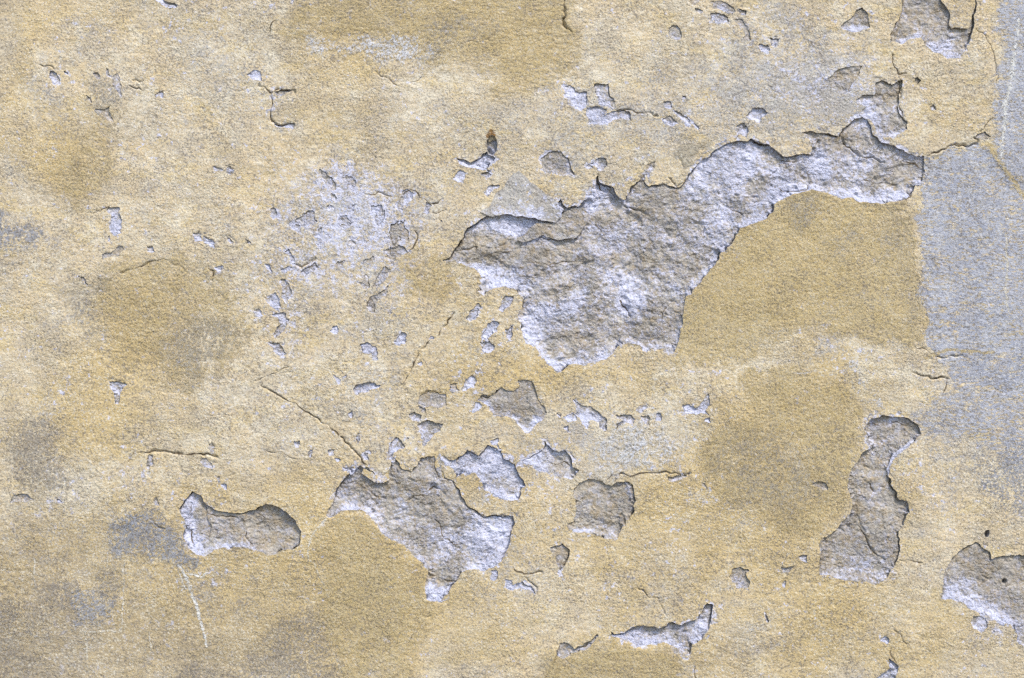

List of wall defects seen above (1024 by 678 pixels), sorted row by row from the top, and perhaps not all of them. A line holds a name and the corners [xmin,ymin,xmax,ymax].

flaking render [890,0,981,59]
peeling [253,249,319,356]
peeling [291,169,444,360]
flaking render [443,57,994,373]
crack [257,368,370,467]
flaking render [179,491,301,556]
flaking render [326,376,662,602]
flaking render [781,411,925,587]
flaking render [554,634,598,660]
flaking render [611,603,713,678]
flaking render [941,538,1024,646]